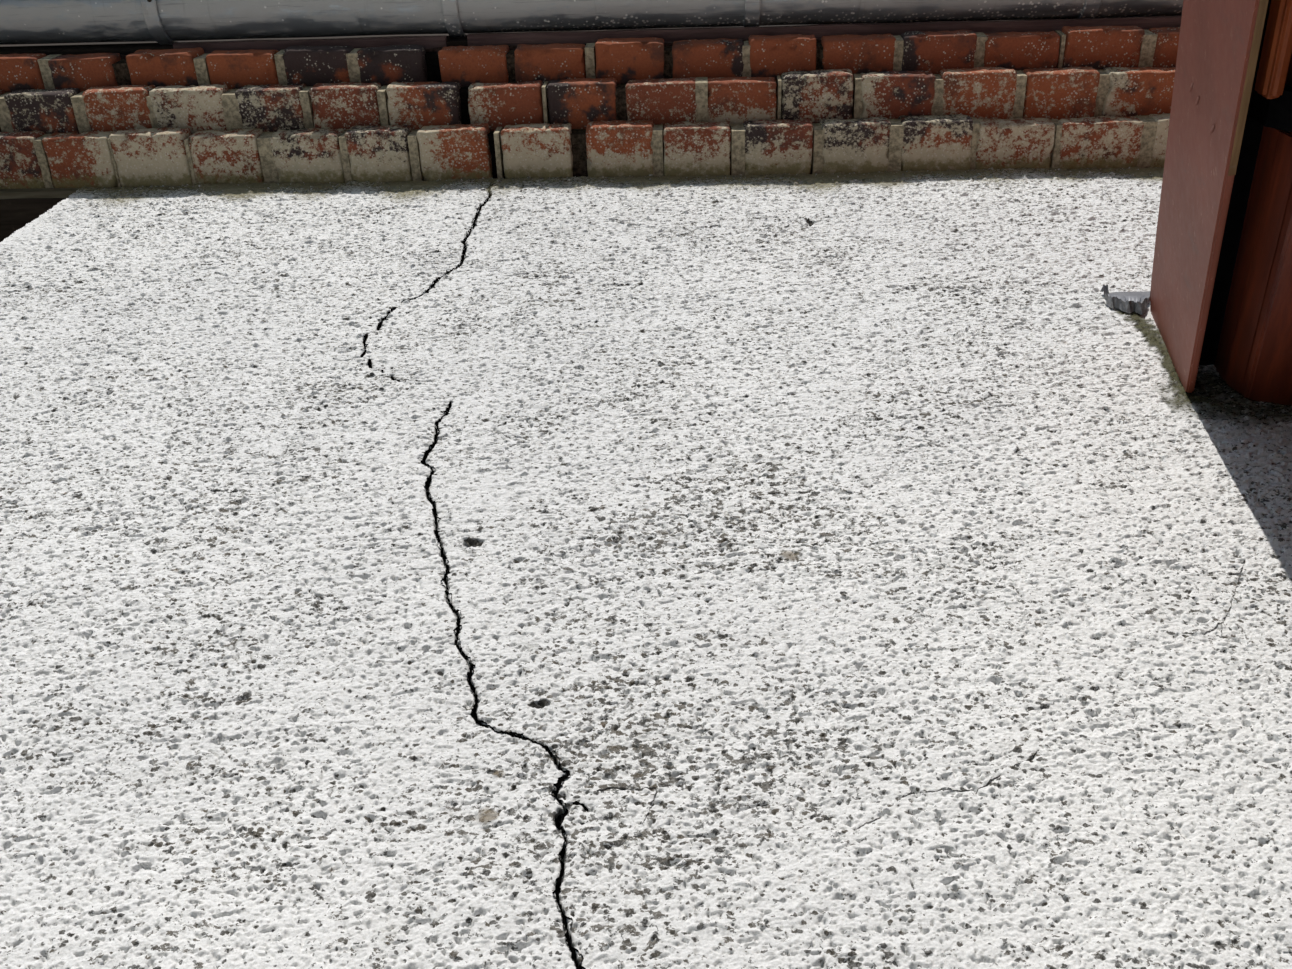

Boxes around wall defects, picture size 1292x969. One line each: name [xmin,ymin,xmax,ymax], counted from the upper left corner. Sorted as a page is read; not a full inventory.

crack [360,52,657,969]